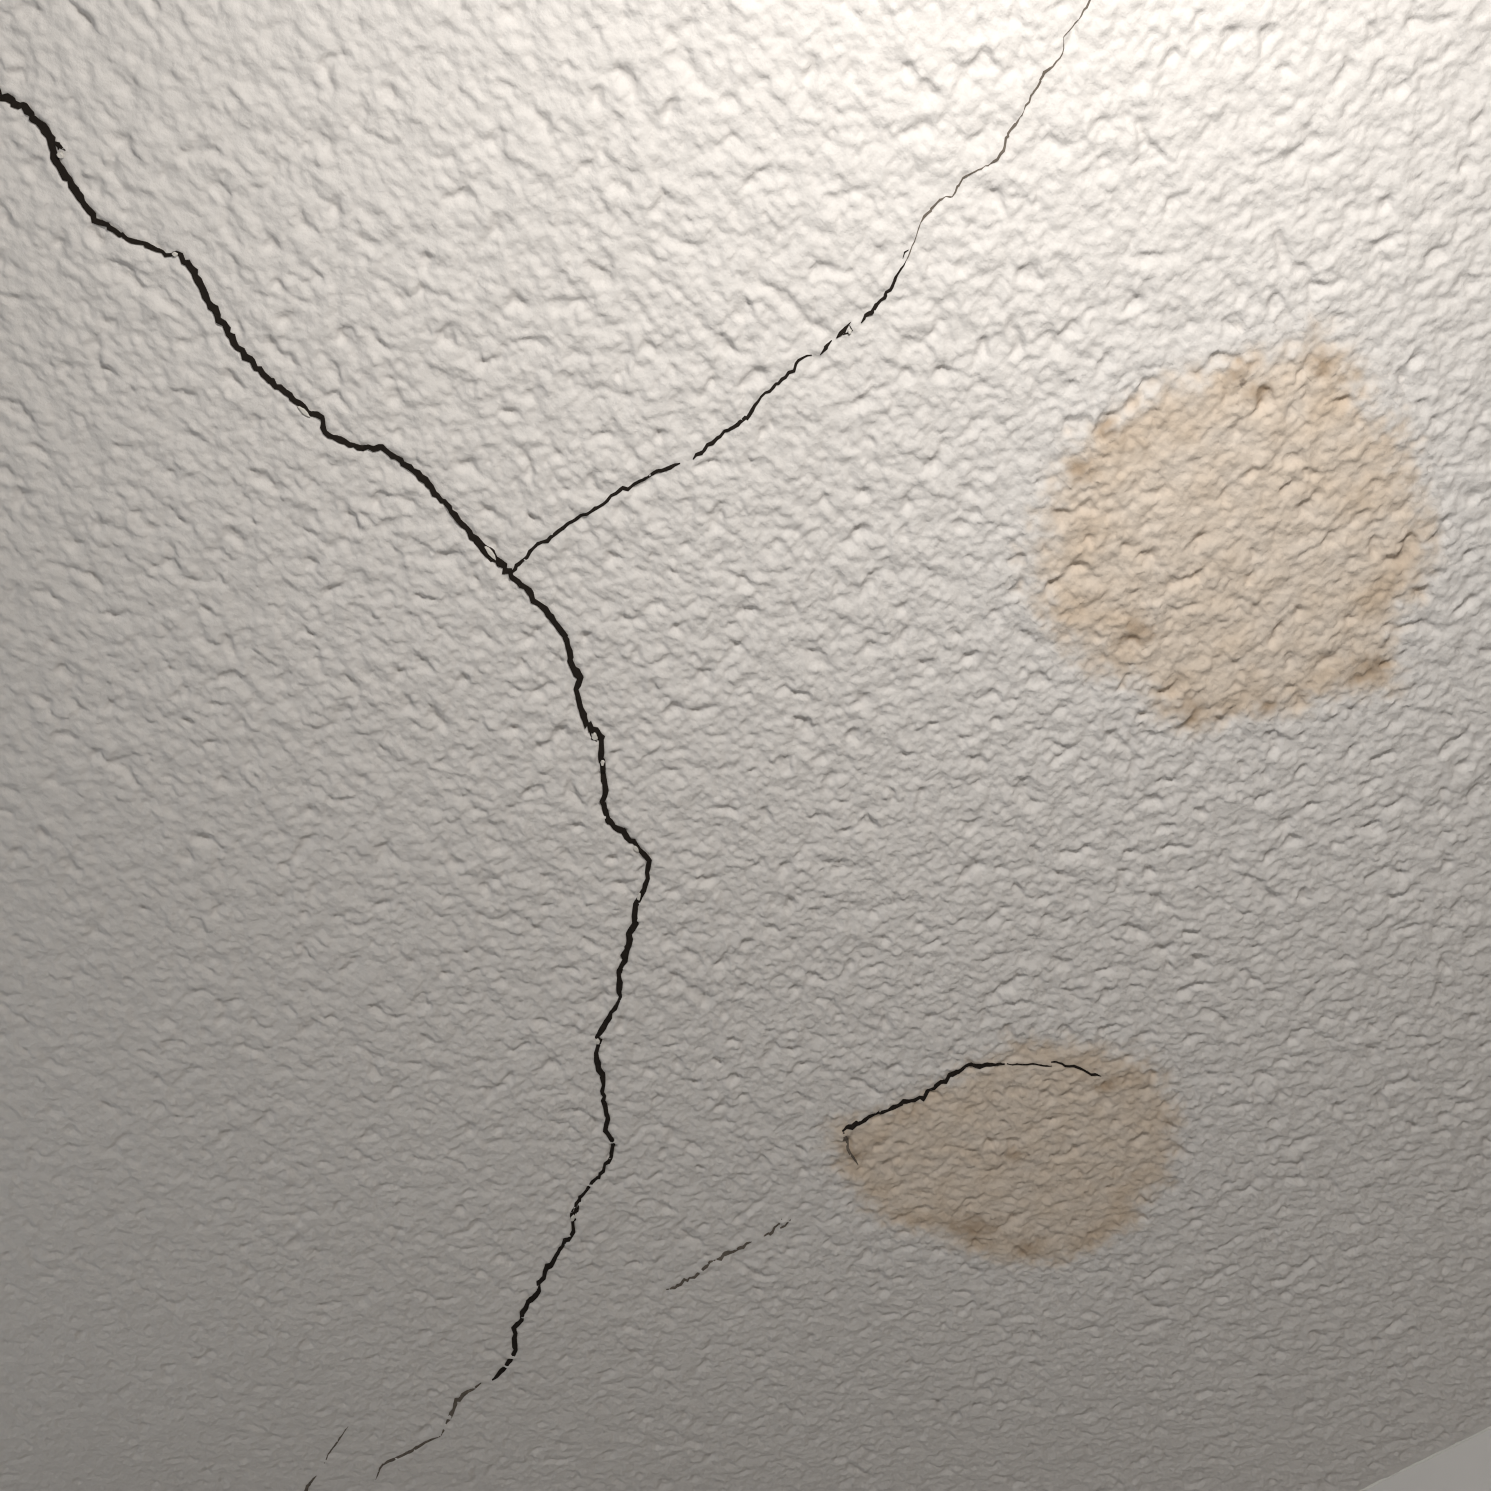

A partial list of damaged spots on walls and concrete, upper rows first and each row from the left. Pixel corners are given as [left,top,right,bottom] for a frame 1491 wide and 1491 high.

crack [0,0,1101,1480]
damp [1000,306,1456,750]
damp [811,1023,1205,1280]
crack [304,1427,348,1491]